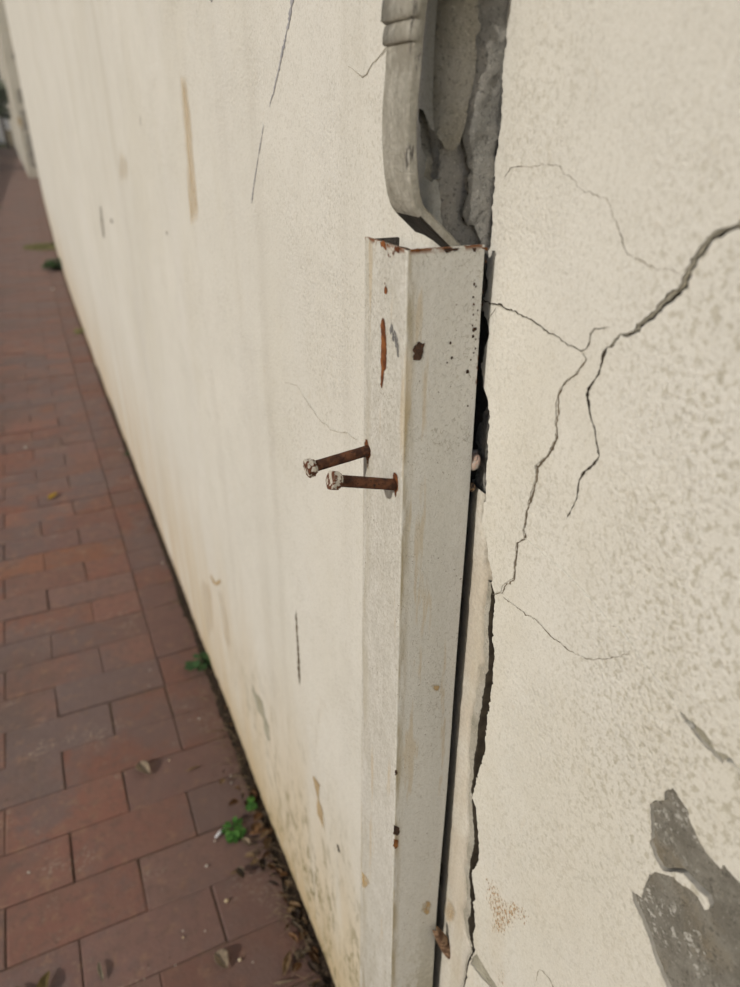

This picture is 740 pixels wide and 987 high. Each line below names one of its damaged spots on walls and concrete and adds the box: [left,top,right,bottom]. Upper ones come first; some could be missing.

crack [251,0,293,204]
spalling [425,0,509,311]
corrosion [413,342,425,360]
crack [461,163,740,987]
peeling [679,712,740,781]
peeling [632,789,740,987]